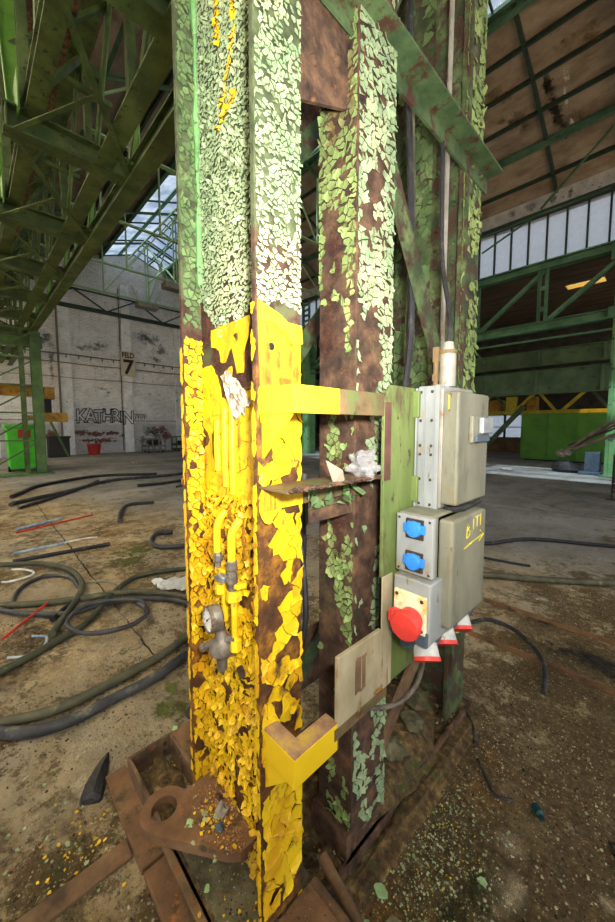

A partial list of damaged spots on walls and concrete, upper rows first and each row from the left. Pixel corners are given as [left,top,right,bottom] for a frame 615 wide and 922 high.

peeling [405,0,437,47]
peeling [466,0,488,140]
damp [535,66,581,139]
peeling [317,4,433,394]
peeling [462,172,483,258]
peeling [457,266,479,393]
peeling [152,0,387,922]
corrosion [329,514,347,560]
corrosion [355,652,367,713]